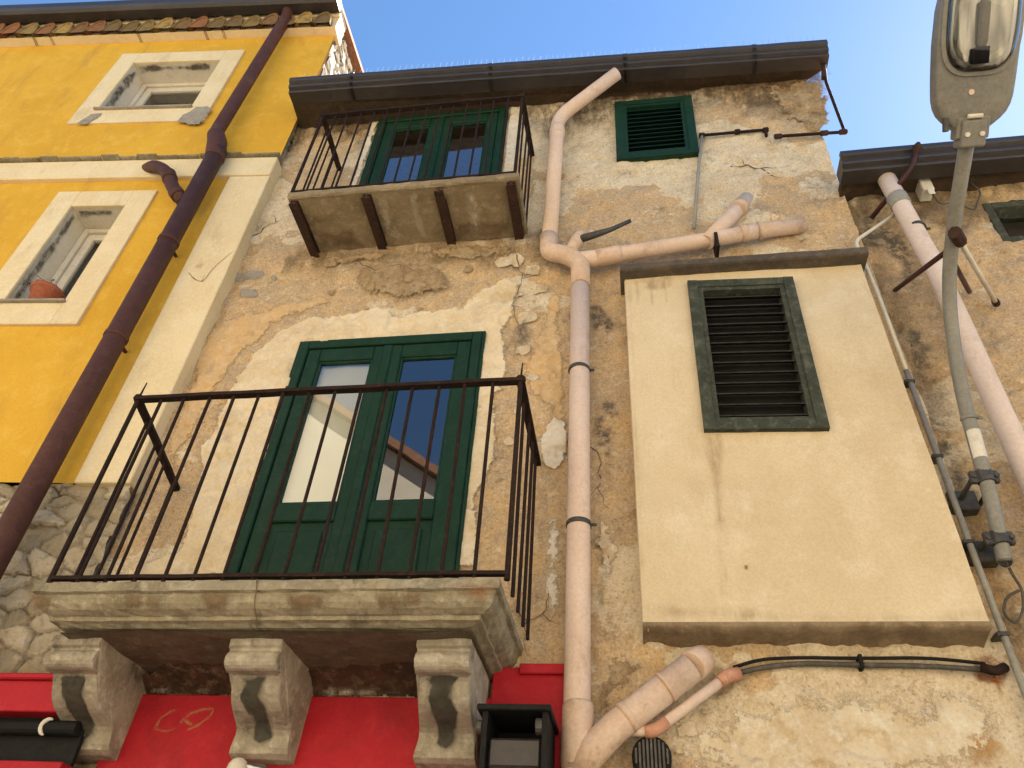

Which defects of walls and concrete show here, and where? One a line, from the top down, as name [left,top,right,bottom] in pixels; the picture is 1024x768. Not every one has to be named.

crack [730,160,780,178]
crack [511,254,547,363]
flaking render [128,253,548,574]
crack [590,446,608,508]